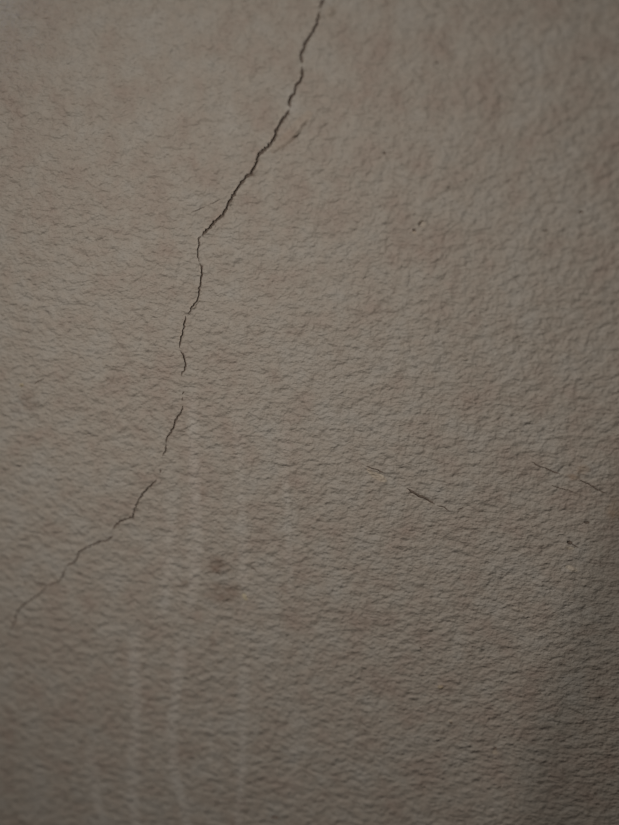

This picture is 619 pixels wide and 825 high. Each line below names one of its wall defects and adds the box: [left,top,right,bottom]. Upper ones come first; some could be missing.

crack [10,0,324,631]